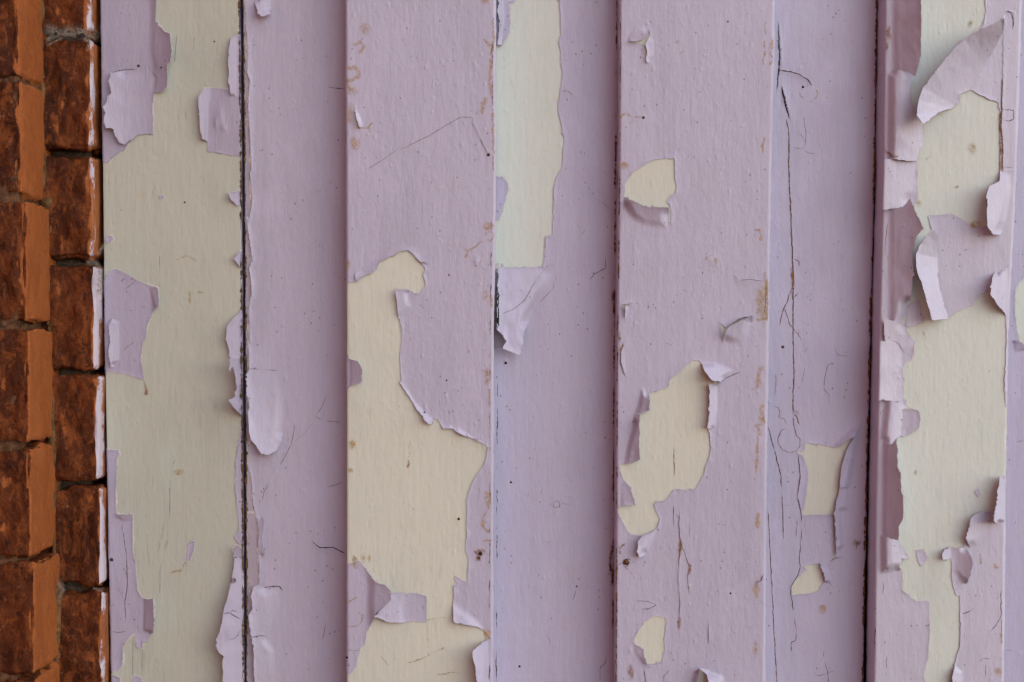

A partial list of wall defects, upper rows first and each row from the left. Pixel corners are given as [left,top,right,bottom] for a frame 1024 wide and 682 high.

peeling [103,0,286,682]
peeling [346,238,491,682]
peeling [494,0,564,354]
peeling [630,616,665,665]
peeling [623,159,676,232]
peeling [617,360,737,557]
crack [725,120,860,682]
peeling [791,563,835,595]
peeling [802,420,862,556]
peeling [877,0,1024,682]